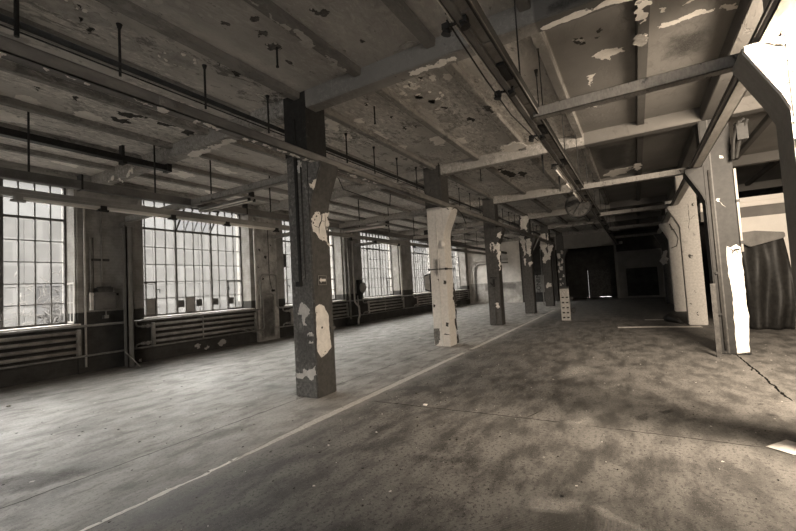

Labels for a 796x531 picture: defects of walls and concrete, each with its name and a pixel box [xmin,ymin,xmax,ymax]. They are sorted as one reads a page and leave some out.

peeling [540,0,666,30]
peeling [659,0,738,28]
peeling [592,47,625,60]
peeling [633,33,648,47]
peeling [603,163,642,177]
peeling [311,212,331,246]
peeling [490,232,502,271]
peeling [519,215,565,288]
peeling [726,244,750,354]
peeling [298,302,331,358]
peeling [296,367,317,381]
crack [737,355,793,401]